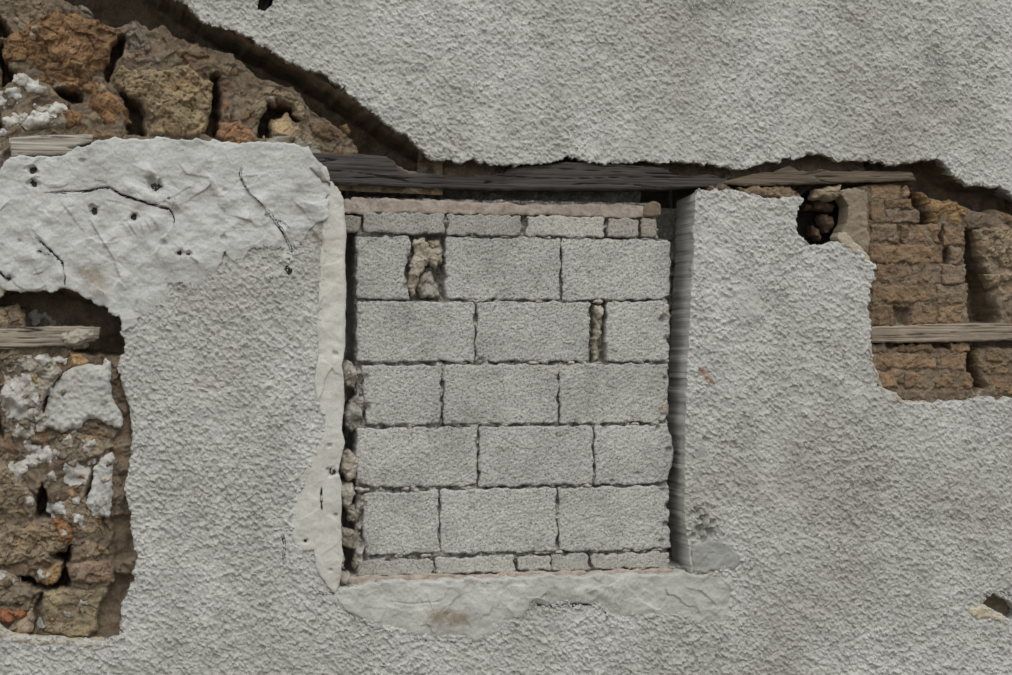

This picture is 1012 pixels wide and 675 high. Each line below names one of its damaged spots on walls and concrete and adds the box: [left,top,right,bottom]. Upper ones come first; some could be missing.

spalling [0,0,583,195]
crack [36,238,66,286]
crack [46,180,176,222]
crack [239,165,293,256]
spalling [626,154,1012,326]
spalling [868,340,1012,405]
spalling [0,277,138,647]